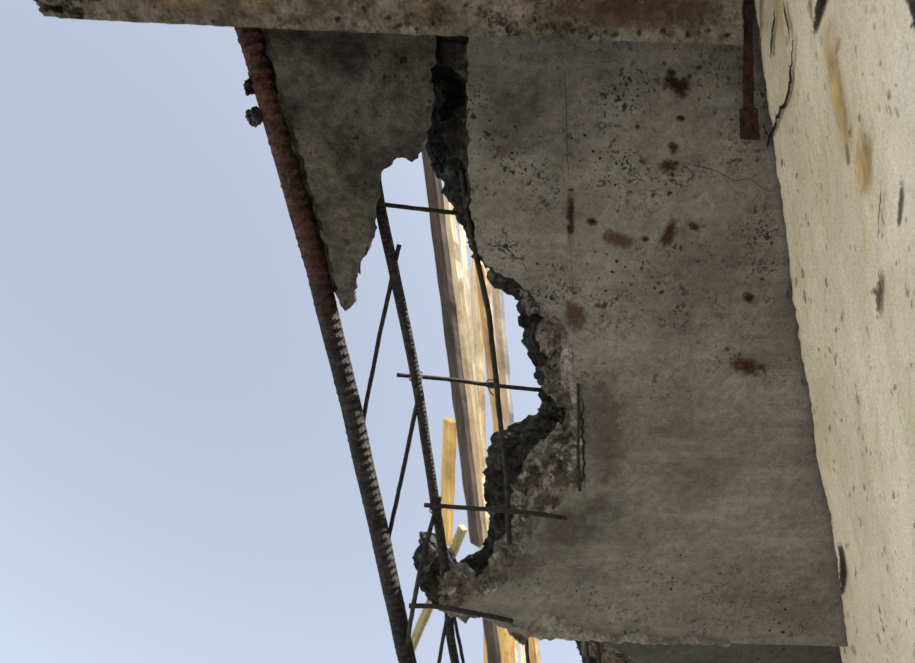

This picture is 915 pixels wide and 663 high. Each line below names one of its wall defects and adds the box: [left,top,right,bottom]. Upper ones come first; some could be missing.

corrosion [663,70,690,99]
crack [764,1,794,148]
corrosion [603,229,649,247]
corrosion [660,220,676,245]
corrosion [733,358,766,377]